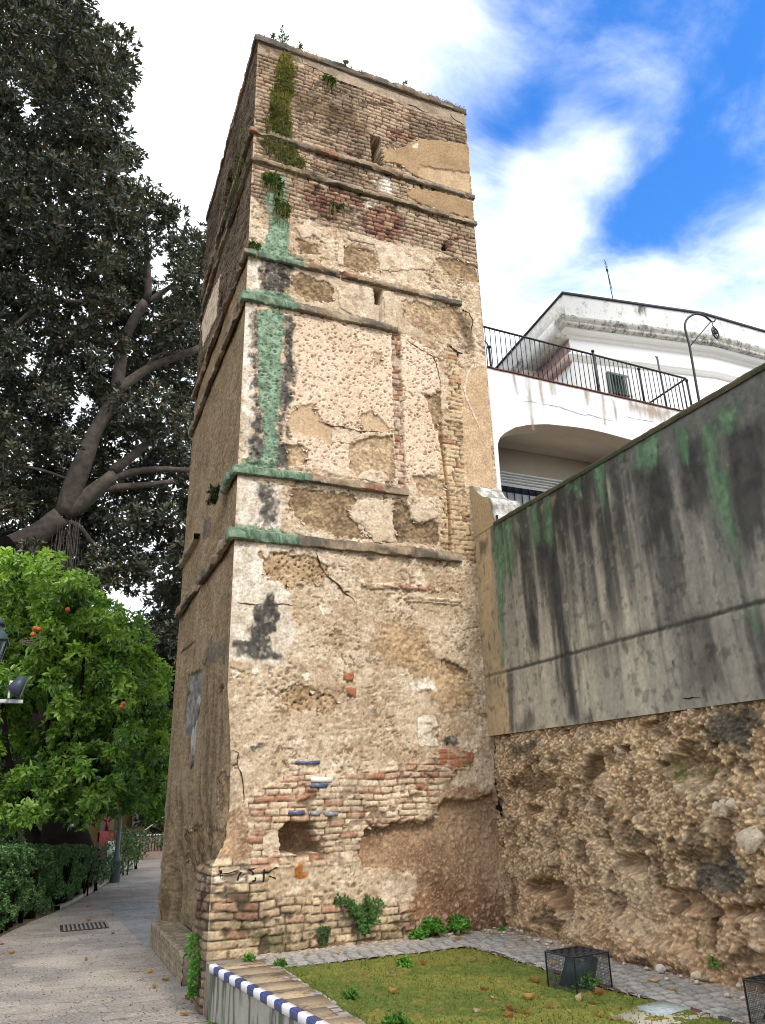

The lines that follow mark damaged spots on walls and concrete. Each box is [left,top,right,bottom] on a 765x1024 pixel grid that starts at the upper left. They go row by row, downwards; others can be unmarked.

flaking render [382,129,474,220]
damp [258,259,296,294]
damp [248,310,297,467]
flaking render [285,403,397,486]
flaking render [288,475,447,547]
damp [637,437,707,546]
damp [205,593,282,666]
flaking render [258,550,328,590]
crack [316,553,358,605]
damp [514,496,578,719]
crack [492,740,503,817]
spalling [278,821,316,854]